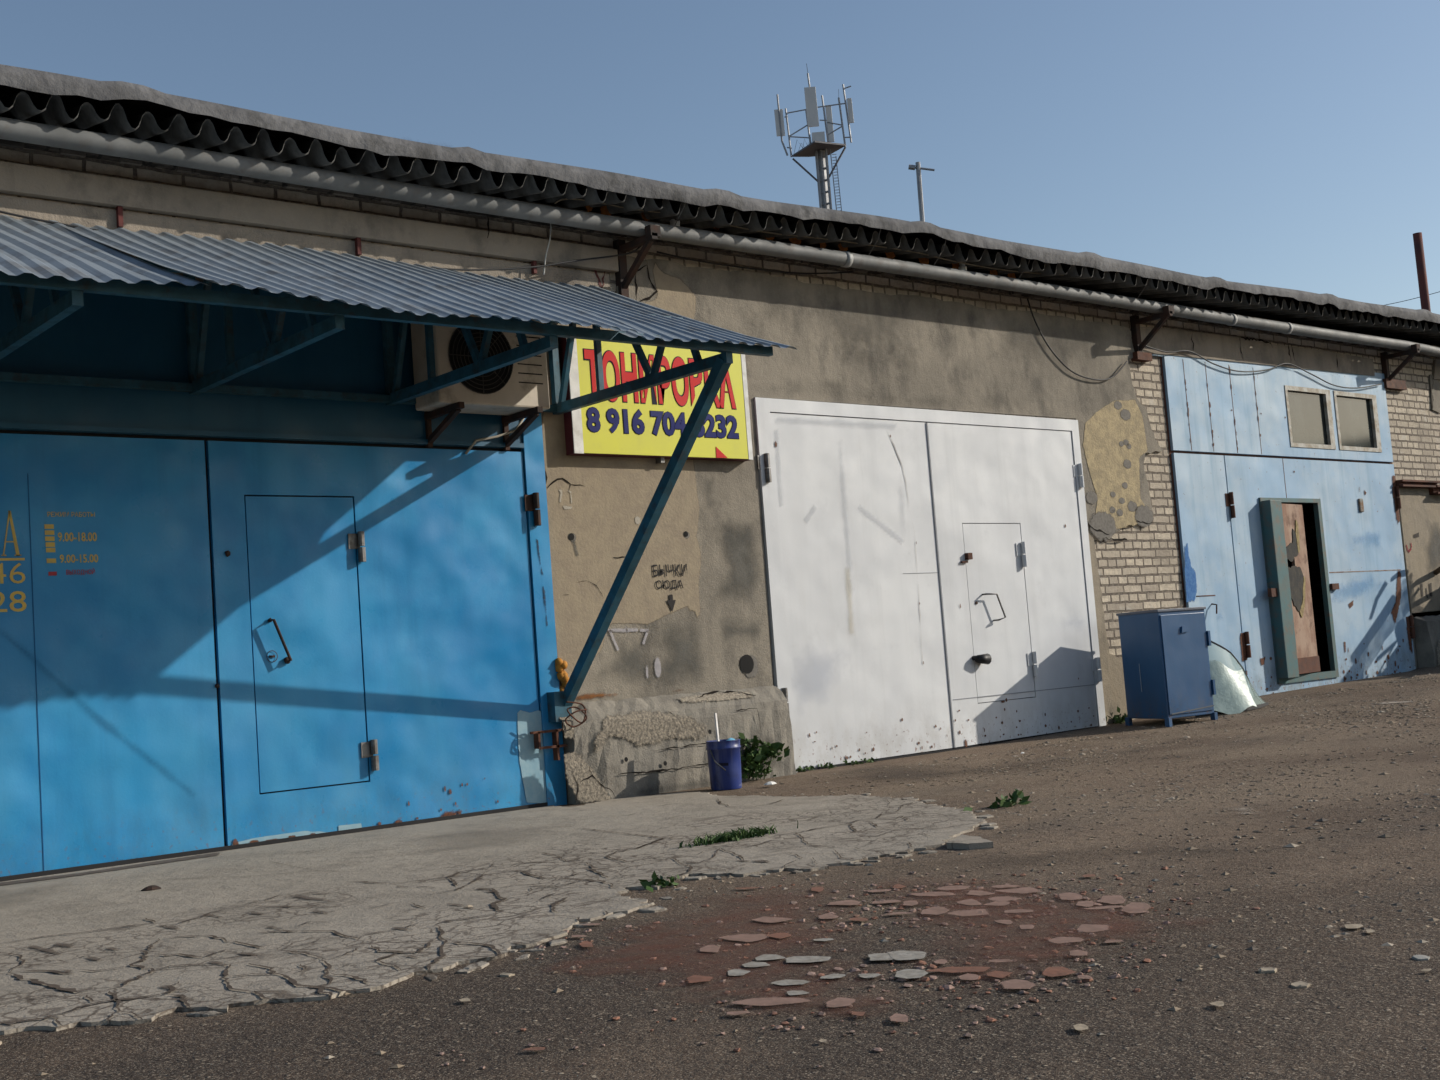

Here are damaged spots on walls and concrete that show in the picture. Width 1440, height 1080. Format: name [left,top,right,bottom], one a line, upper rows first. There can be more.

peeling [1083,400,1154,541]
corrosion [1392,475,1400,523]
corrosion [1240,635,1274,694]
corrosion [1343,571,1413,682]
crack [0,691,963,1028]